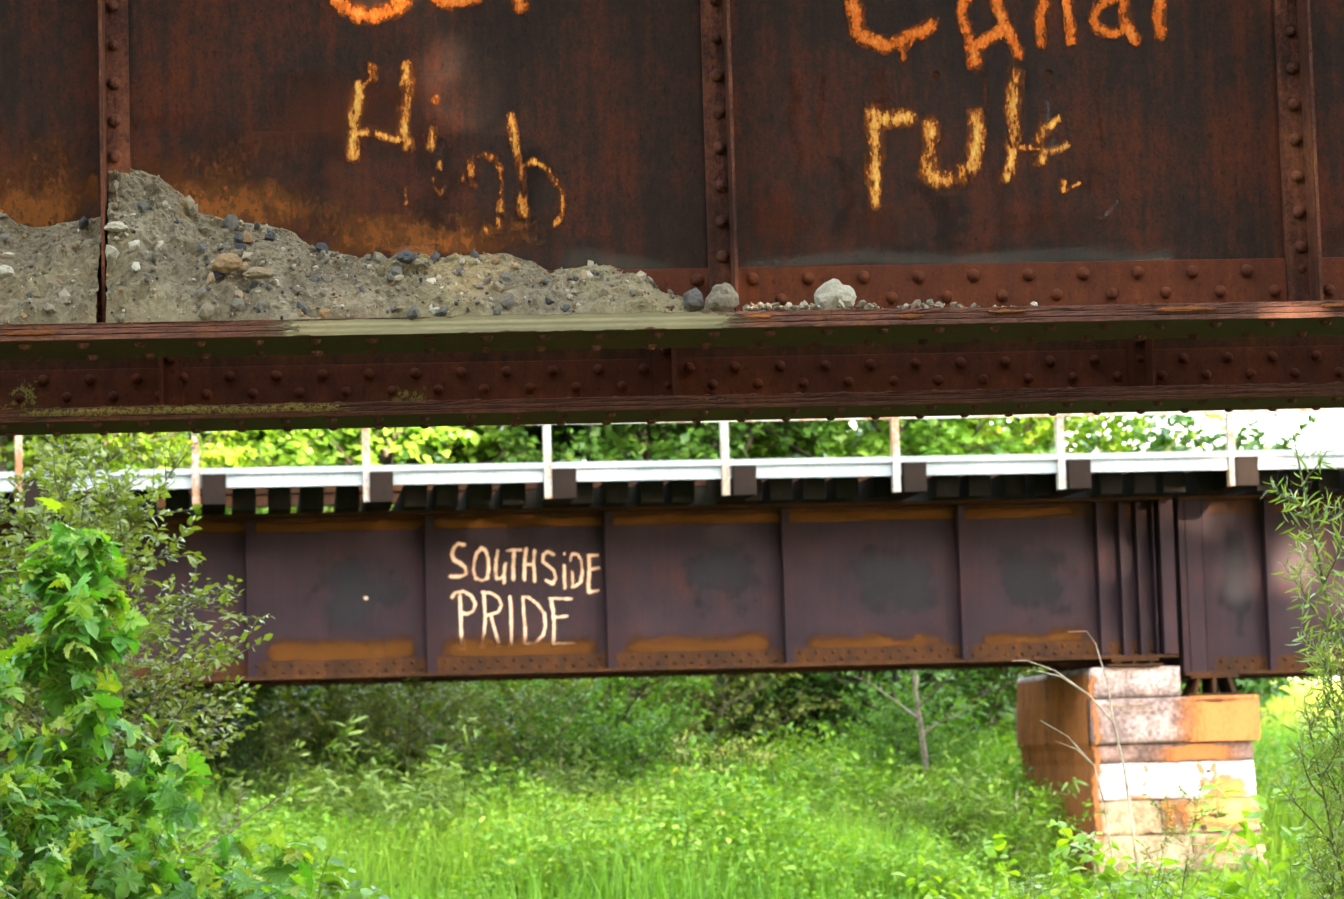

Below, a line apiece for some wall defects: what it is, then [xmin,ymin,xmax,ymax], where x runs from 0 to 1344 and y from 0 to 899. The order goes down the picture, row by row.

rust [0,146,100,227]
rust [150,141,537,257]